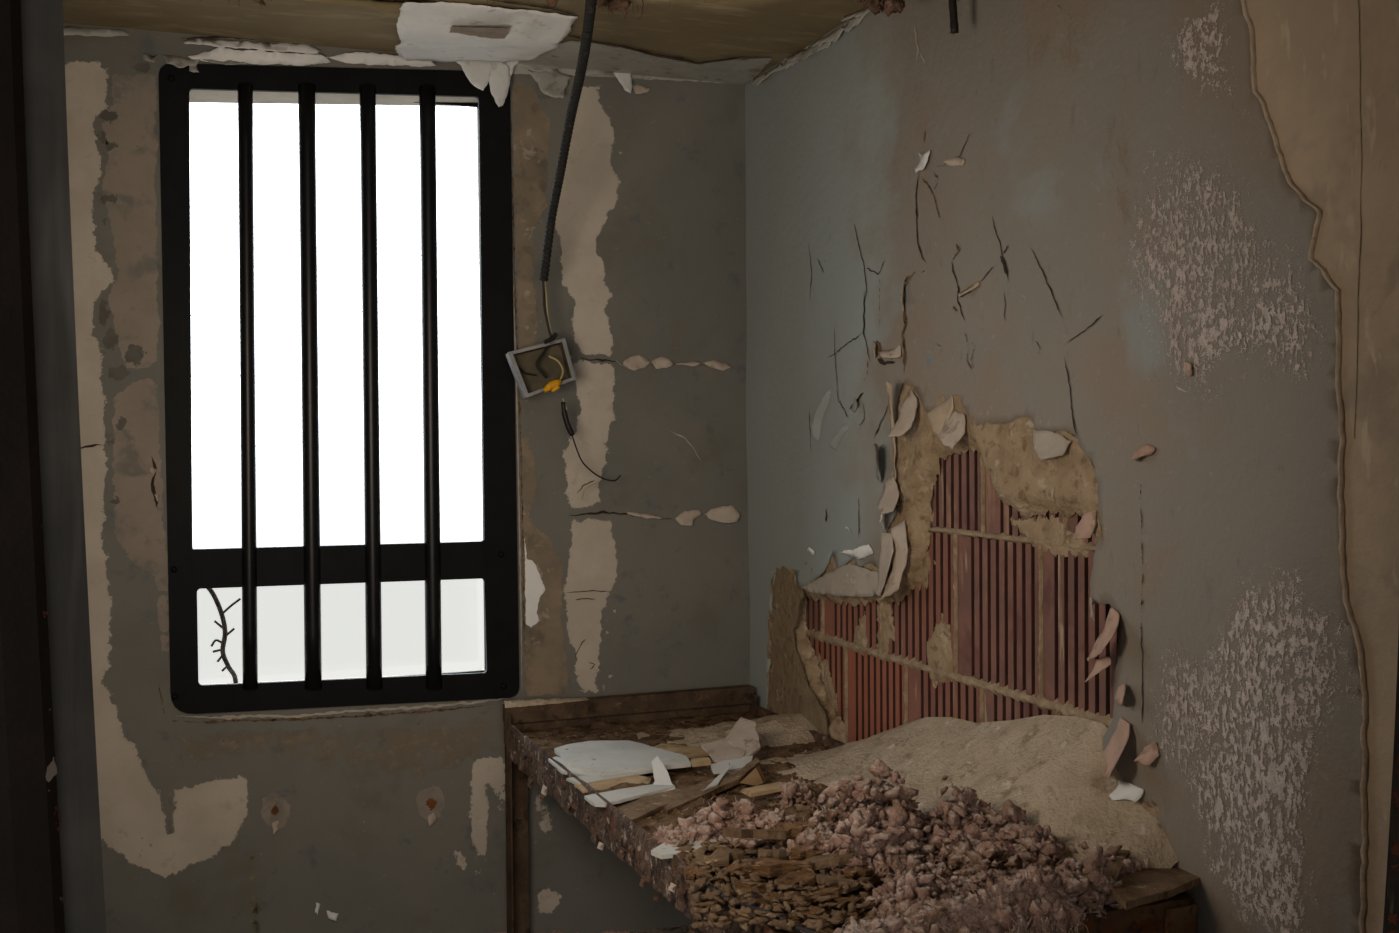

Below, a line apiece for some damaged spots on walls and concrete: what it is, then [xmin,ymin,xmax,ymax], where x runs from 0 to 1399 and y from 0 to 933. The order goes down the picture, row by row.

peeling [915,150,965,173]
peeling [64,0,870,895]
crack [829,225,888,437]
peeling [878,345,901,358]
crack [951,218,1101,435]
spalling [1240,0,1369,933]
spalling [766,381,1160,818]
efflorescence [1141,562,1362,933]
peeling [537,887,562,914]